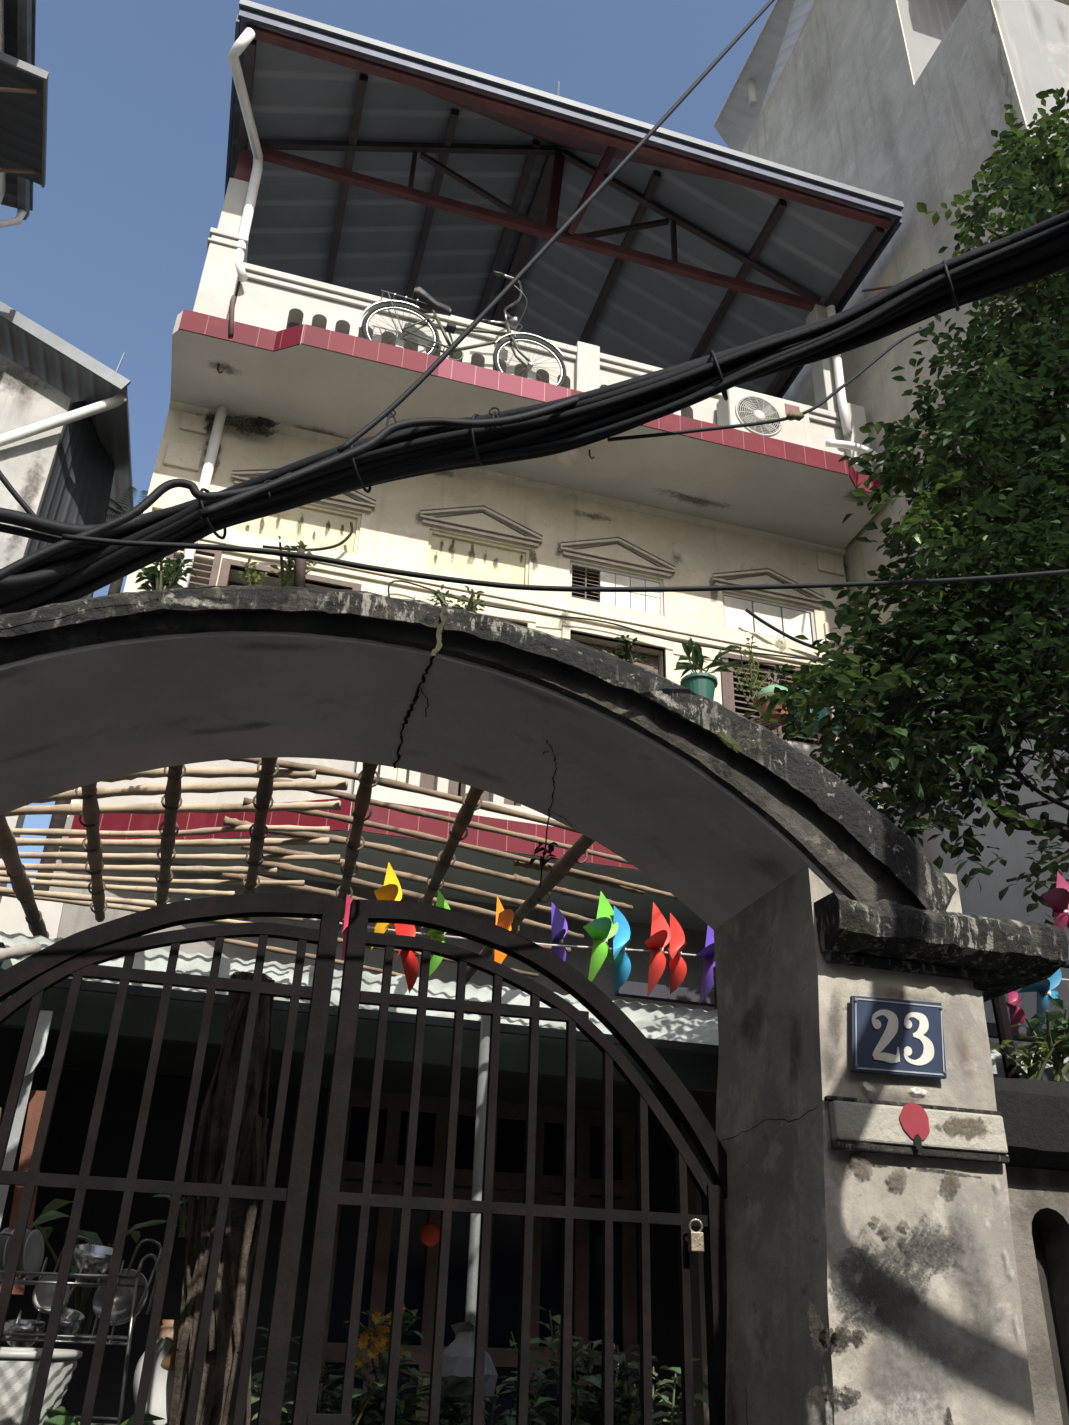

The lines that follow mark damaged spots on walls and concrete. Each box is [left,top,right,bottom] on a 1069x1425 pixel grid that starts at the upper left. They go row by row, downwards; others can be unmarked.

water stain [197,410,279,468]
crack [393,606,446,768]
crack [721,1106,818,1142]
crack [835,1139,993,1160]
water stain [935,1116,992,1140]
water stain [871,1312,965,1414]